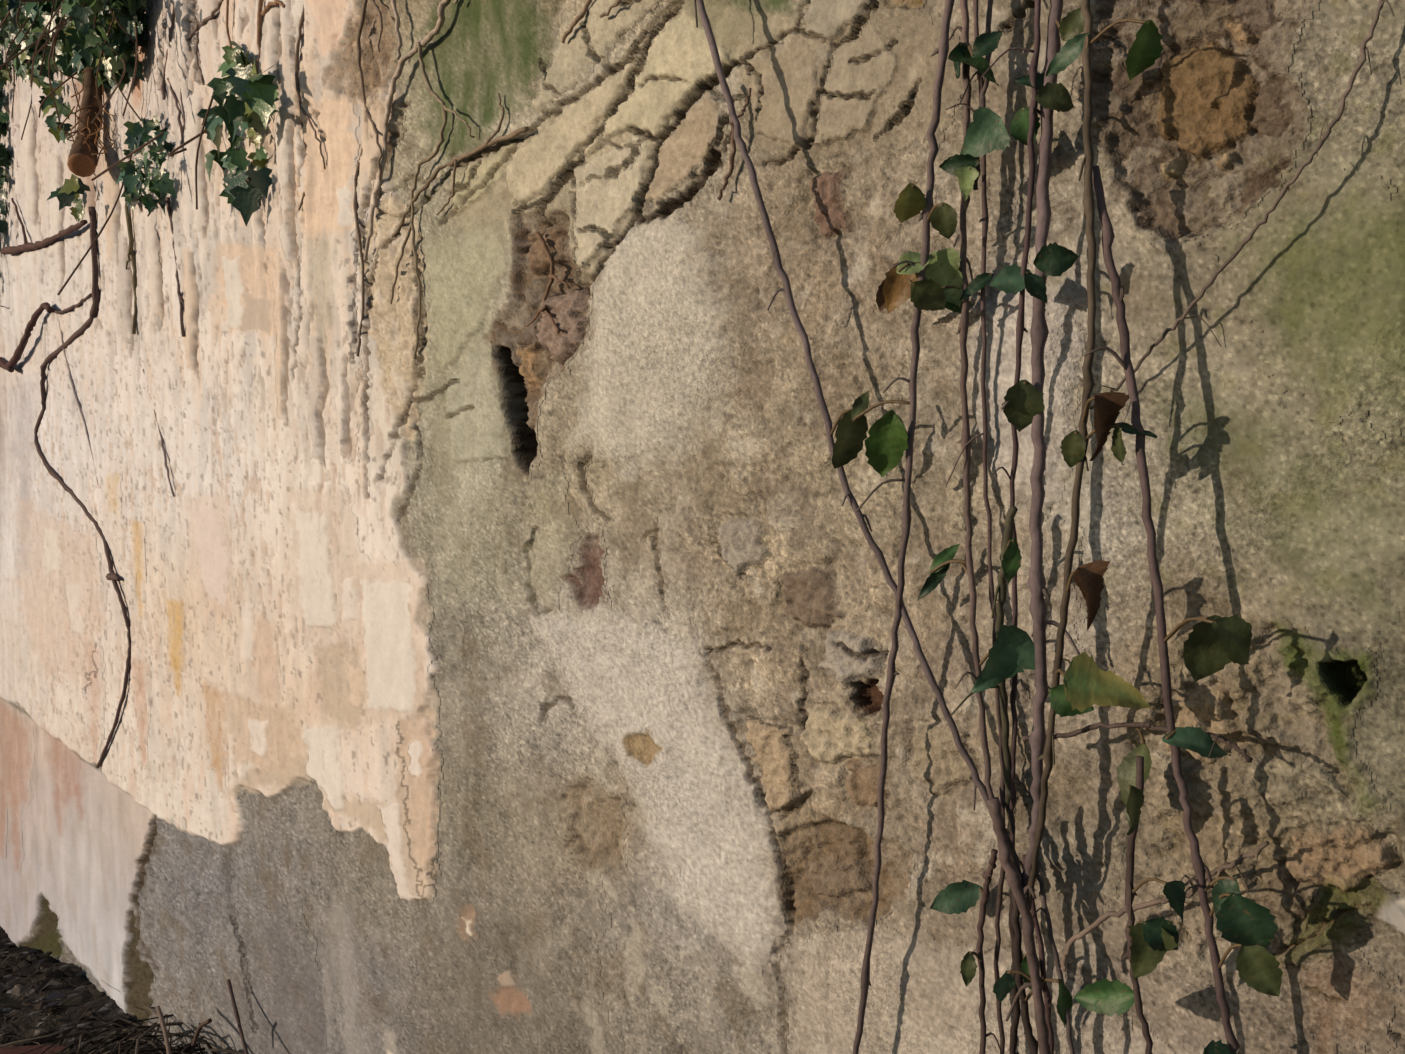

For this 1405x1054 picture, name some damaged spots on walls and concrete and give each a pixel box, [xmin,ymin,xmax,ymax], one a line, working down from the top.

spalling [11,0,1036,953]
crack [348,0,919,525]
crack [984,0,1035,36]
spalling [1074,0,1320,253]
spalling [1019,495,1405,993]